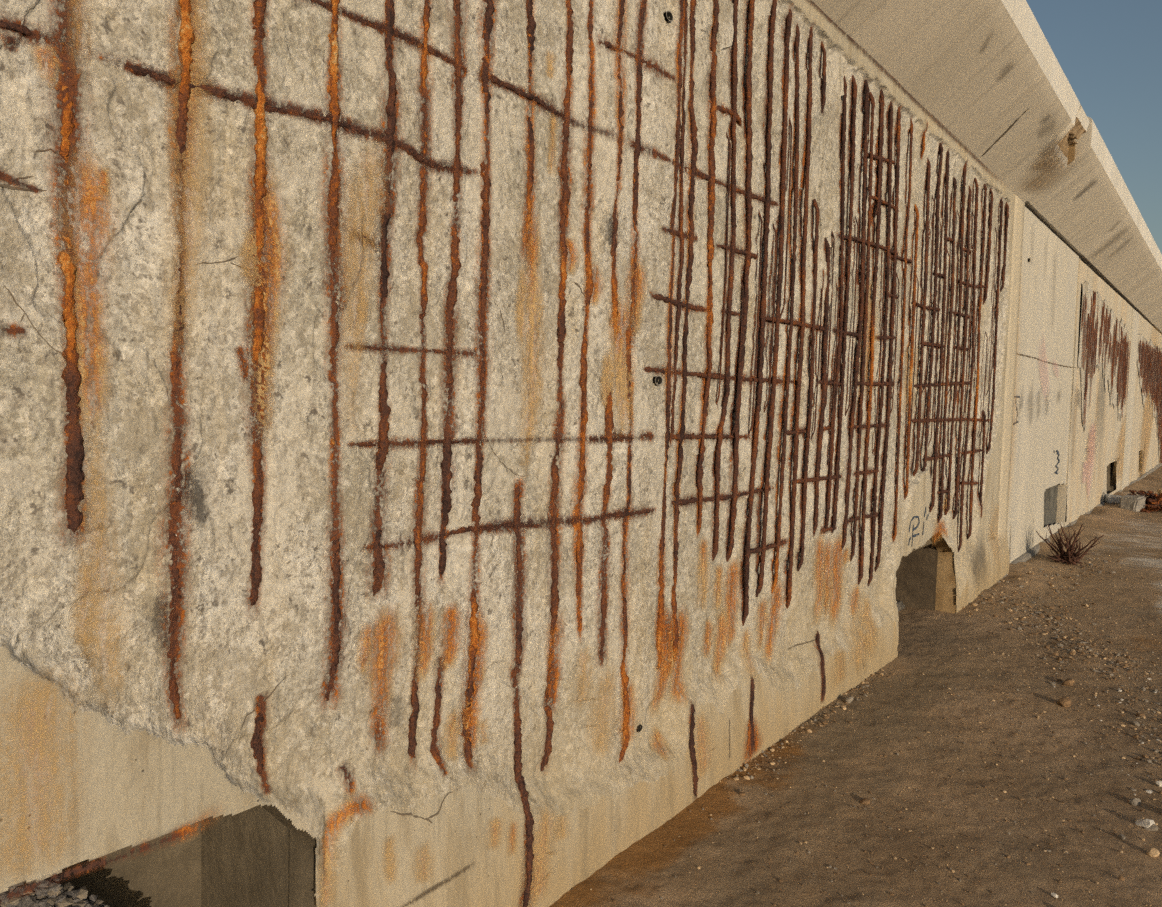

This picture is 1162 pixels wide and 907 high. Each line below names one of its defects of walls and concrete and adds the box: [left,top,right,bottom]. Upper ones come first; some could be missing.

rust [126,14,463,170]
rust [312,0,458,62]
spalling [1058,114,1086,160]
rust [75,162,109,420]
rust [243,182,282,420]
rust [413,231,652,459]
spalling [1078,281,1162,464]
rust [473,513,619,534]
rust [362,614,398,750]
rust [420,607,487,757]
rust [546,623,560,706]
rust [698,541,781,676]